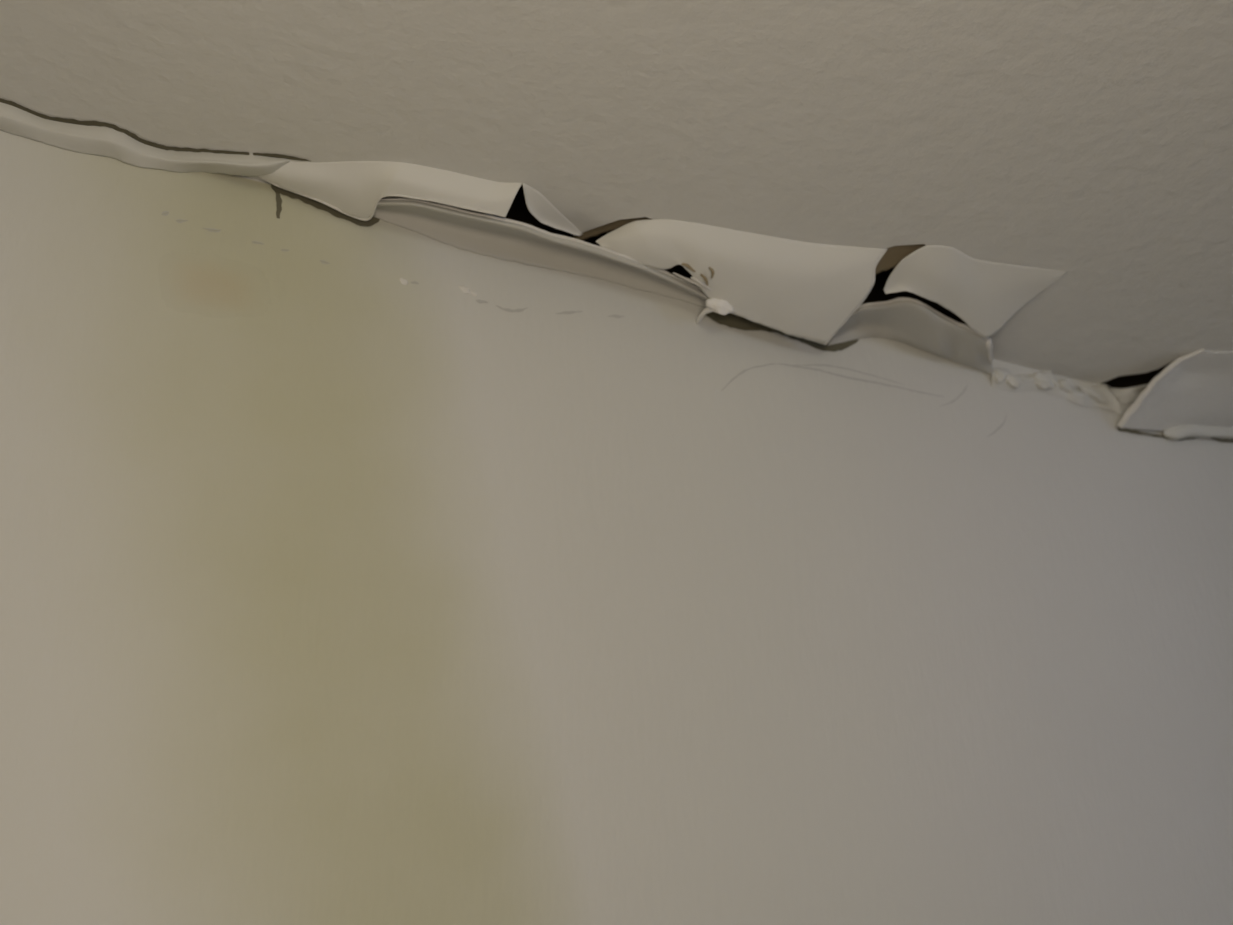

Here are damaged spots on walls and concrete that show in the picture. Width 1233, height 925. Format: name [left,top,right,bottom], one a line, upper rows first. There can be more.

crack [0,98,310,218]
peeling [258,161,582,236]
peeling [595,219,1067,345]
peeling [991,348,1233,431]